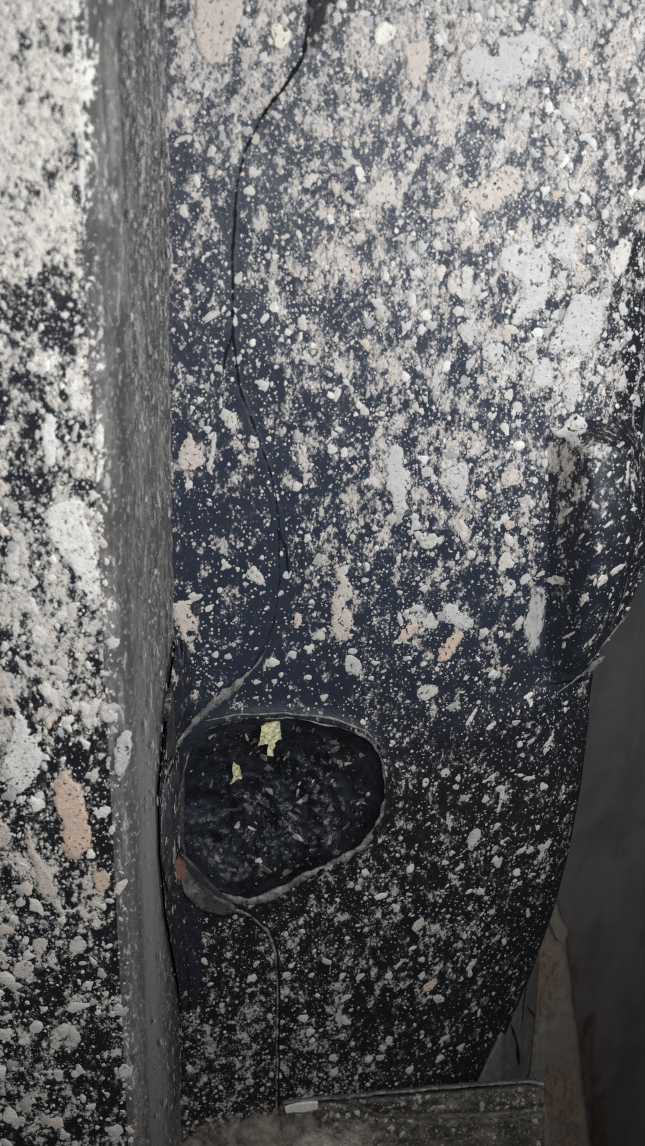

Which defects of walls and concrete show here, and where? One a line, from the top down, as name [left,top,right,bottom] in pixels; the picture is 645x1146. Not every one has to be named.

crack [222,0,311,670]